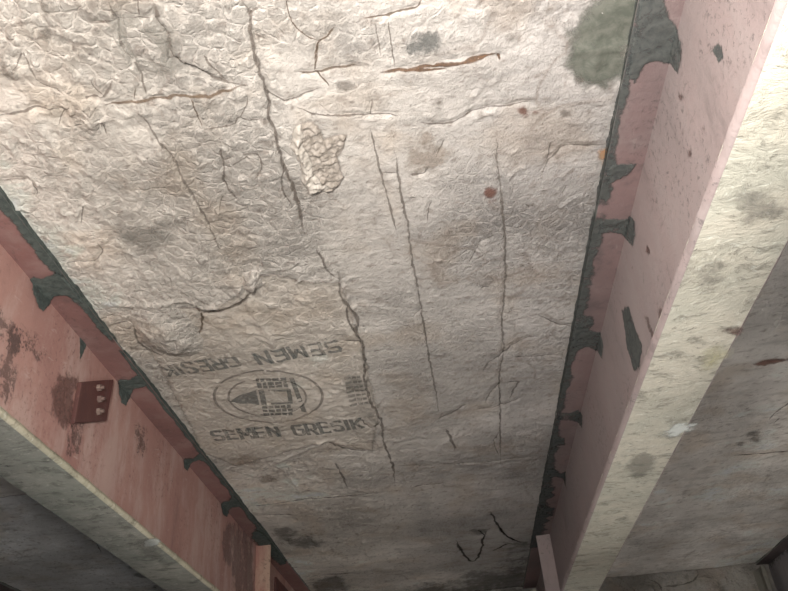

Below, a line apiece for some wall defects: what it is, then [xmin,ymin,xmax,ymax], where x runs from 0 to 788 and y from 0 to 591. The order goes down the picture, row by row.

mould [406,31,439,54]
crack [366,1,500,72]
peeling [628,0,681,83]
crack [85,0,390,241]
spalling [290,122,347,195]
leakage [566,0,640,205]
peeling [30,274,83,311]
crack [371,136,437,395]
corrosion [0,309,42,403]
corrosion [52,375,83,456]
leakage [530,214,605,548]
peeling [622,307,642,371]